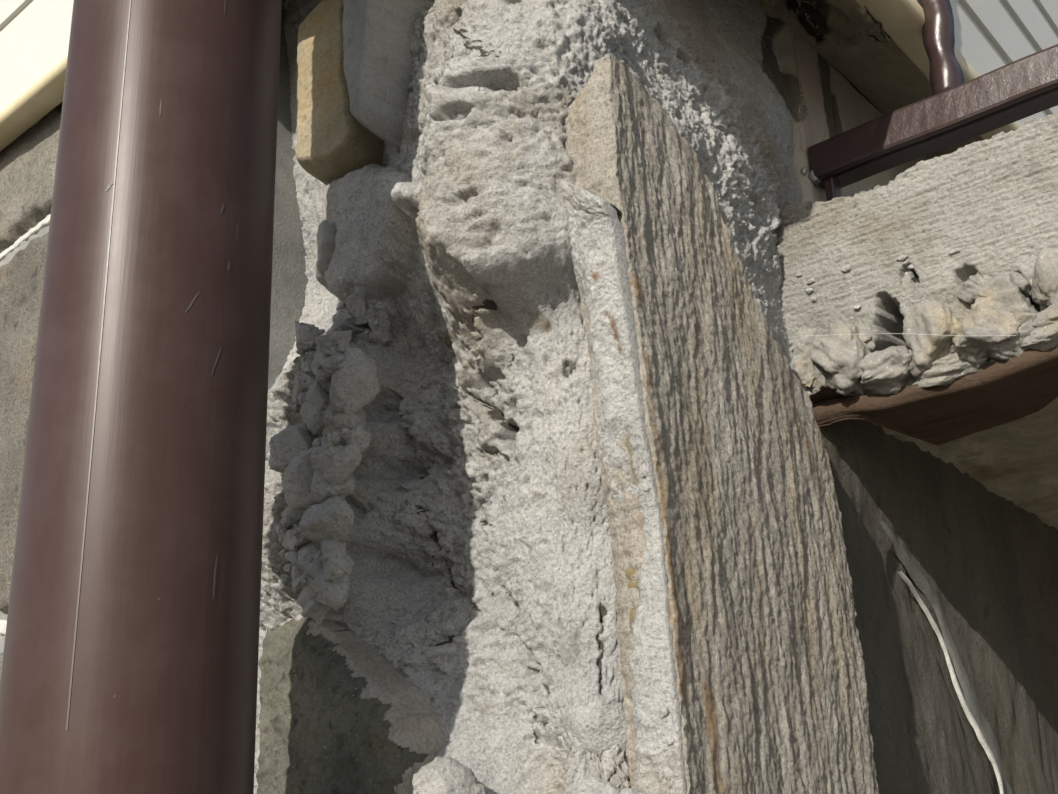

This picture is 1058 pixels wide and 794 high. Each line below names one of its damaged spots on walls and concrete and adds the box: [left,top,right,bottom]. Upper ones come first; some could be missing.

crack [467,299,519,432]
spalling [792,247,1058,397]
crack [415,505,510,611]
crack [421,635,458,654]
crack [596,598,607,693]
crack [532,707,564,743]